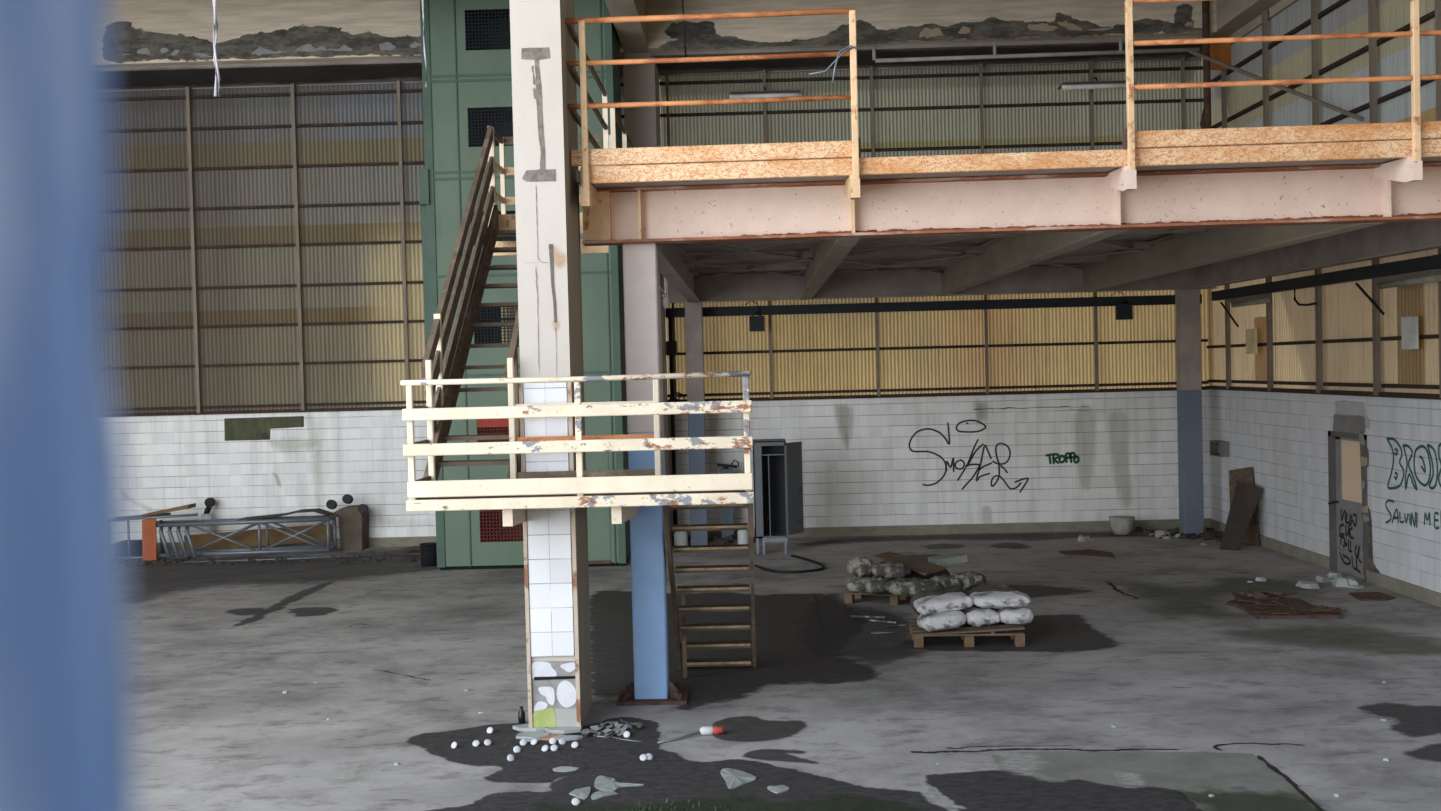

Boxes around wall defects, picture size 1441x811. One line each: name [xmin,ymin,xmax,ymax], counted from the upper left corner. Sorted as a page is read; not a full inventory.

peeling [108,21,421,63]
peeling [659,4,1202,50]
peeling [224,416,304,441]
peeling [531,661,577,727]